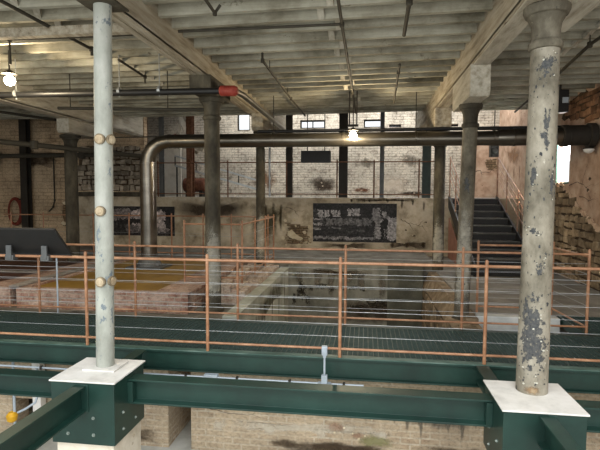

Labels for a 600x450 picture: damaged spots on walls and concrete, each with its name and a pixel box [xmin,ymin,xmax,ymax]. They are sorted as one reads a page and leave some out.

peeling [528,50,557,98]
spalling [562,86,600,124]
spalling [526,104,600,291]
flaking render [281,219,311,248]
peeling [518,291,551,386]